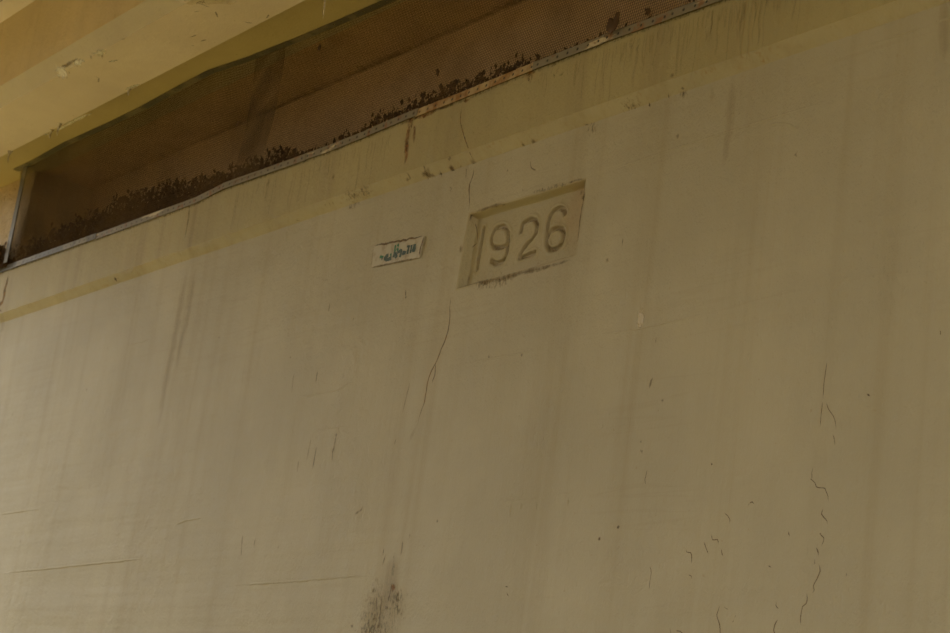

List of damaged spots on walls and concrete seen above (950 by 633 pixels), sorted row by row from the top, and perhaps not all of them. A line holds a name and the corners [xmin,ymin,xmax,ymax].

crack [420,317,450,414]